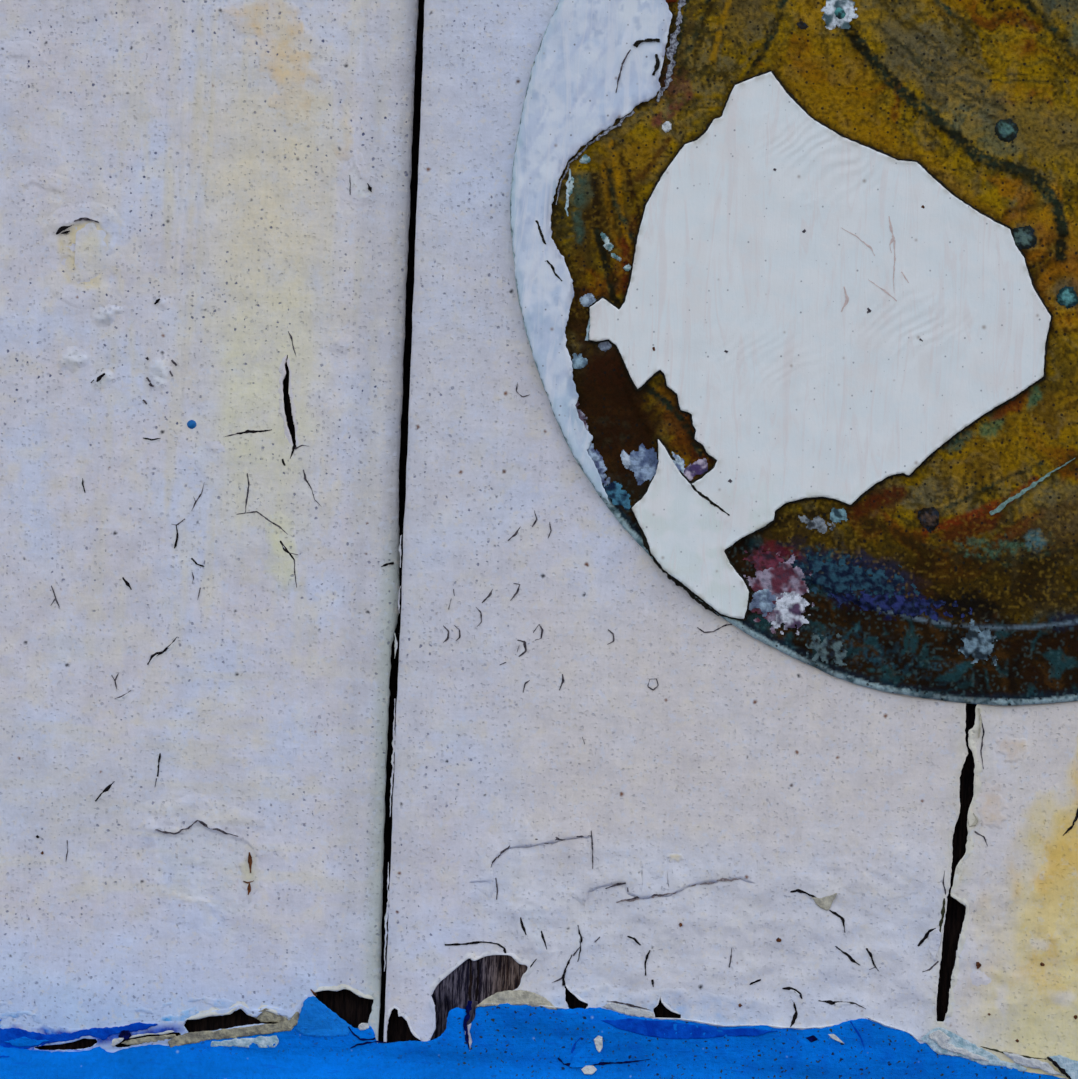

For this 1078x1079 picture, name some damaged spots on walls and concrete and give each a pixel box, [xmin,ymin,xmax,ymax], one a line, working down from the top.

crack [225,331,321,506]
crack [237,473,298,588]
peeling [34,1036,97,1050]
peeling [111,813,757,1050]
peeling [558,1036,650,1068]
crack [627,936,654,987]
peeling [601,997,843,1043]
crack [729,948,866,1027]
crack [790,889,879,971]
crack [917,703,988,1022]
peeling [865,1016,1078,1079]
rust [922,702,1078,1079]